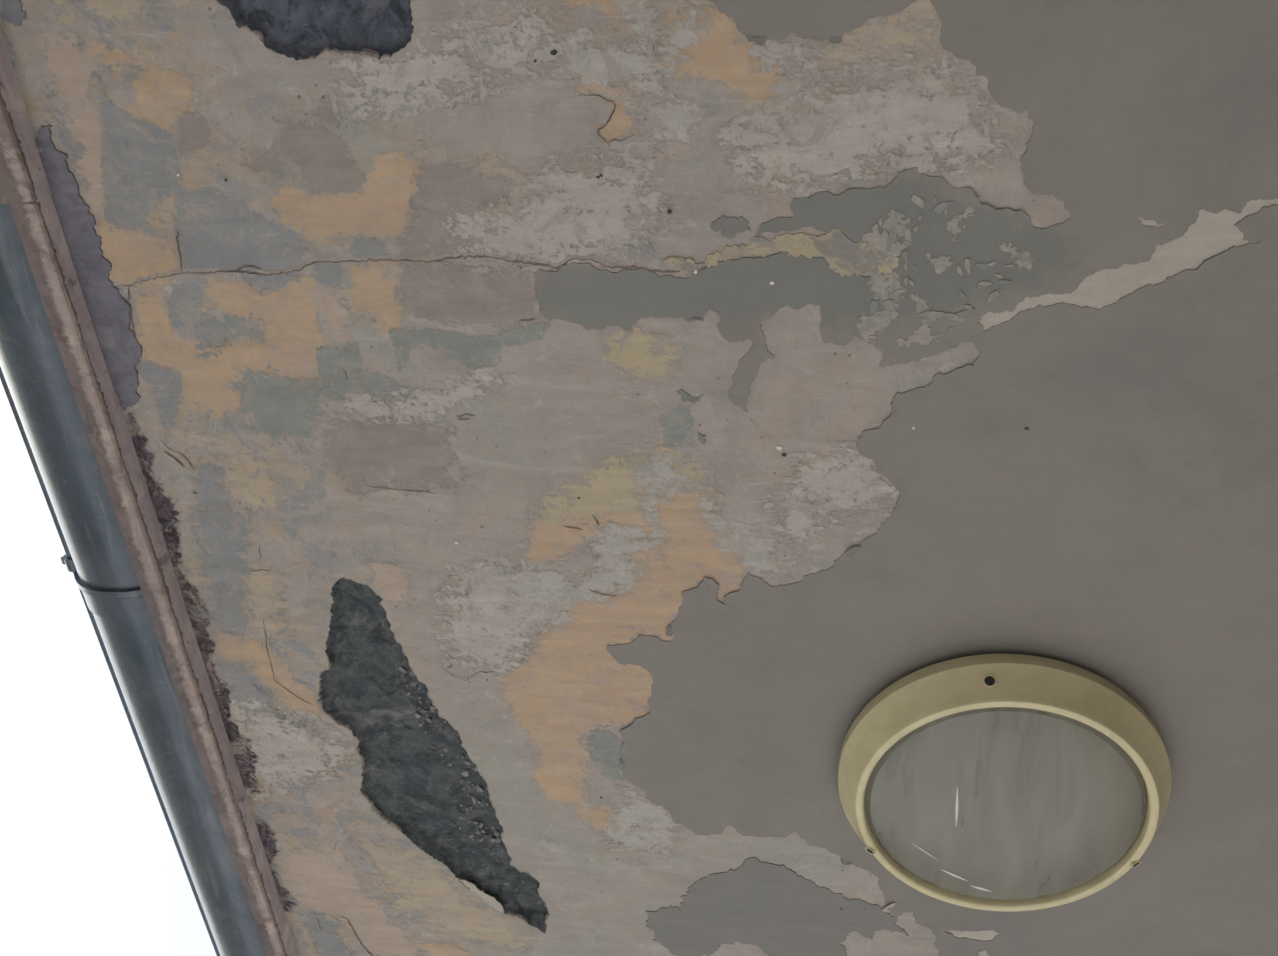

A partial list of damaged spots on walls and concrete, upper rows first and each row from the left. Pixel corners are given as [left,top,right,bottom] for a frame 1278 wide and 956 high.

crack [112,231,826,338]
peeling [896,289,976,348]
peeling [925,253,996,283]
peeling [977,198,1278,331]
peeling [210,651,460,887]
peeling [270,868,370,956]
peeling [945,930,1000,956]